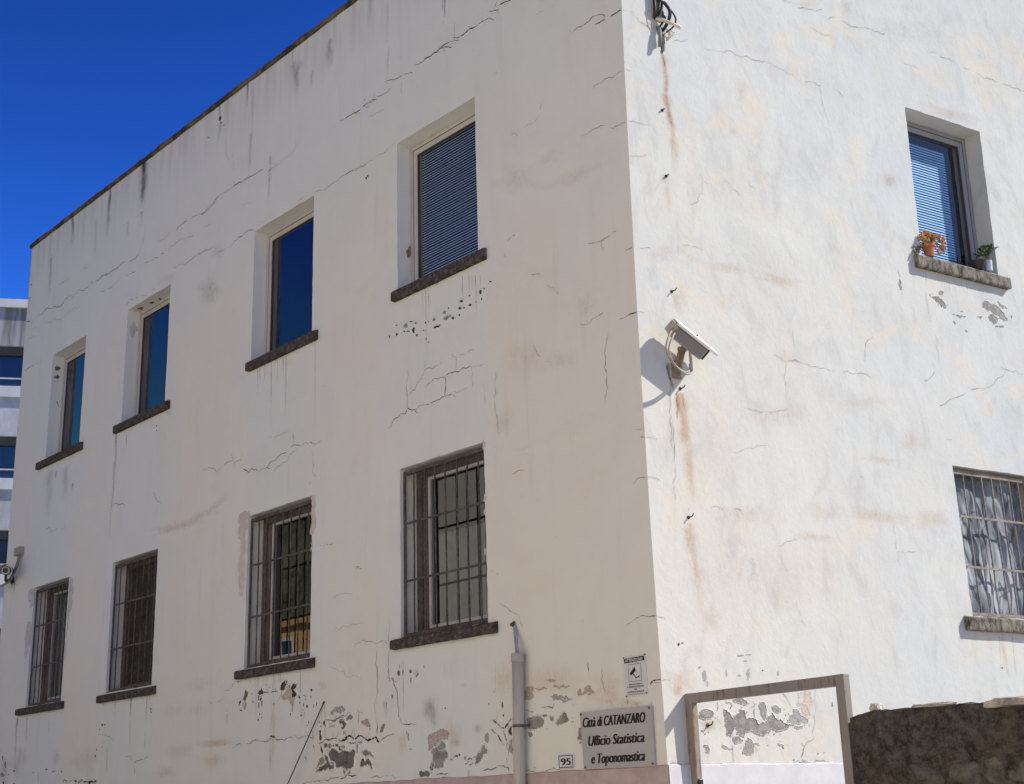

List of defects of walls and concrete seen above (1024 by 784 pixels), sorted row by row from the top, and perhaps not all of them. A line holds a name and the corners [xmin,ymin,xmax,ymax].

flaking render [236,678,386,775]